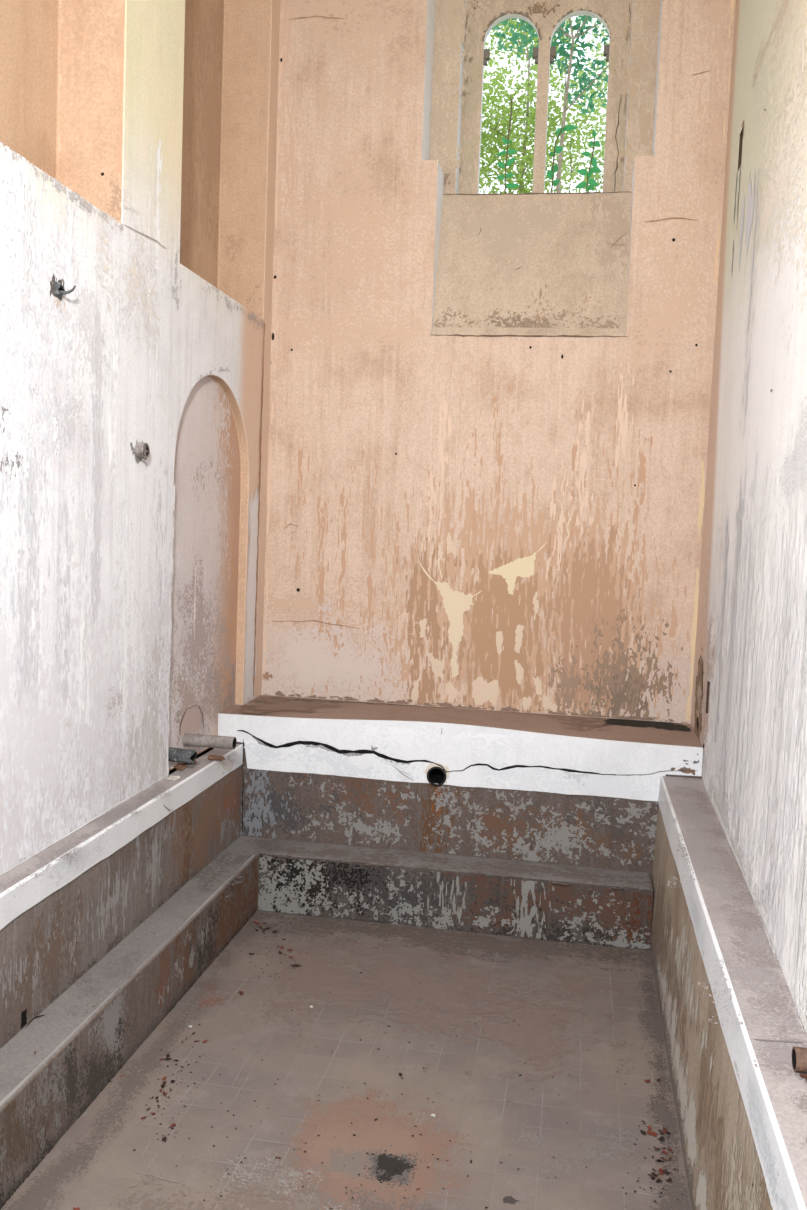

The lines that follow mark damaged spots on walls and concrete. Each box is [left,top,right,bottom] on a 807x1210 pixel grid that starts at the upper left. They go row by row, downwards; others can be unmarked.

water stain [0,0,183,747]
crack [179,705,204,735]
water stain [154,379,240,777]
crack [253,323,354,697]
peeling [412,532,482,703]
crack [237,730,688,832]
peeling [472,677,499,707]
peeling [489,542,547,595]
peeling [496,592,557,712]
water stain [0,810,187,1024]
water stain [210,768,773,1210]
water stain [0,1008,135,1194]